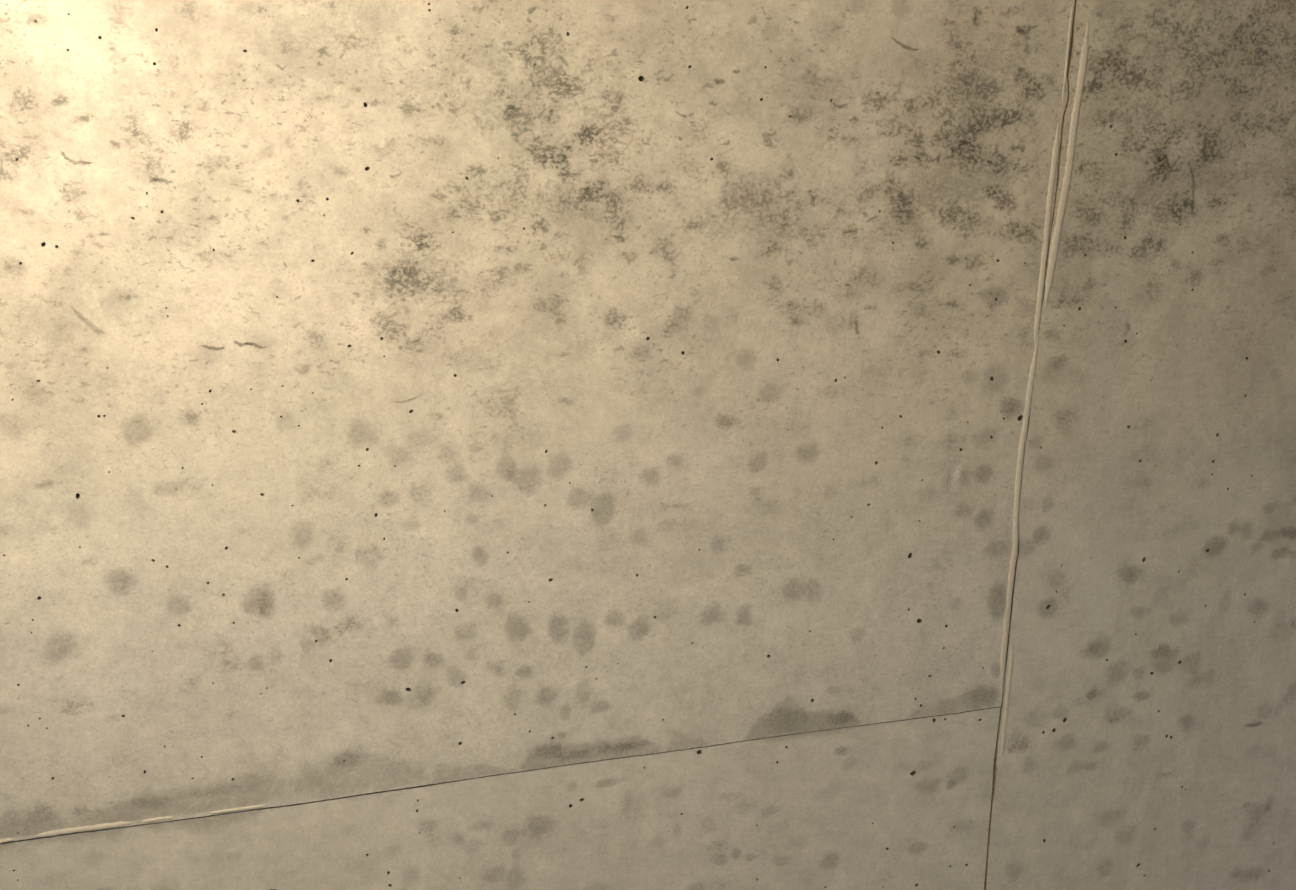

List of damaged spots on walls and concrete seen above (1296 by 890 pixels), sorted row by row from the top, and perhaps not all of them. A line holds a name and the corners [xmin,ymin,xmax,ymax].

crack [0,714,949,844]
crack [953,0,1089,890]